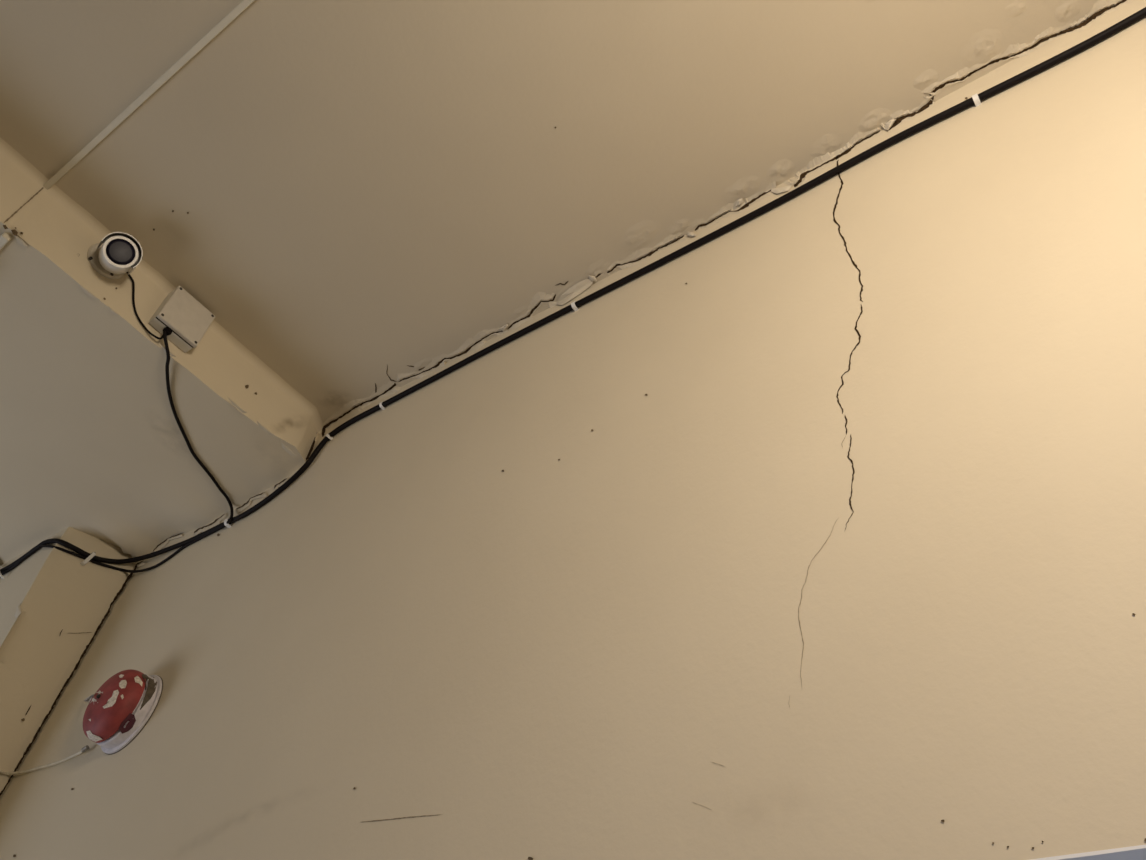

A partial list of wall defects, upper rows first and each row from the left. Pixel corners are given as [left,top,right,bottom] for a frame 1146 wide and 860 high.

crack [306,0,1132,708]